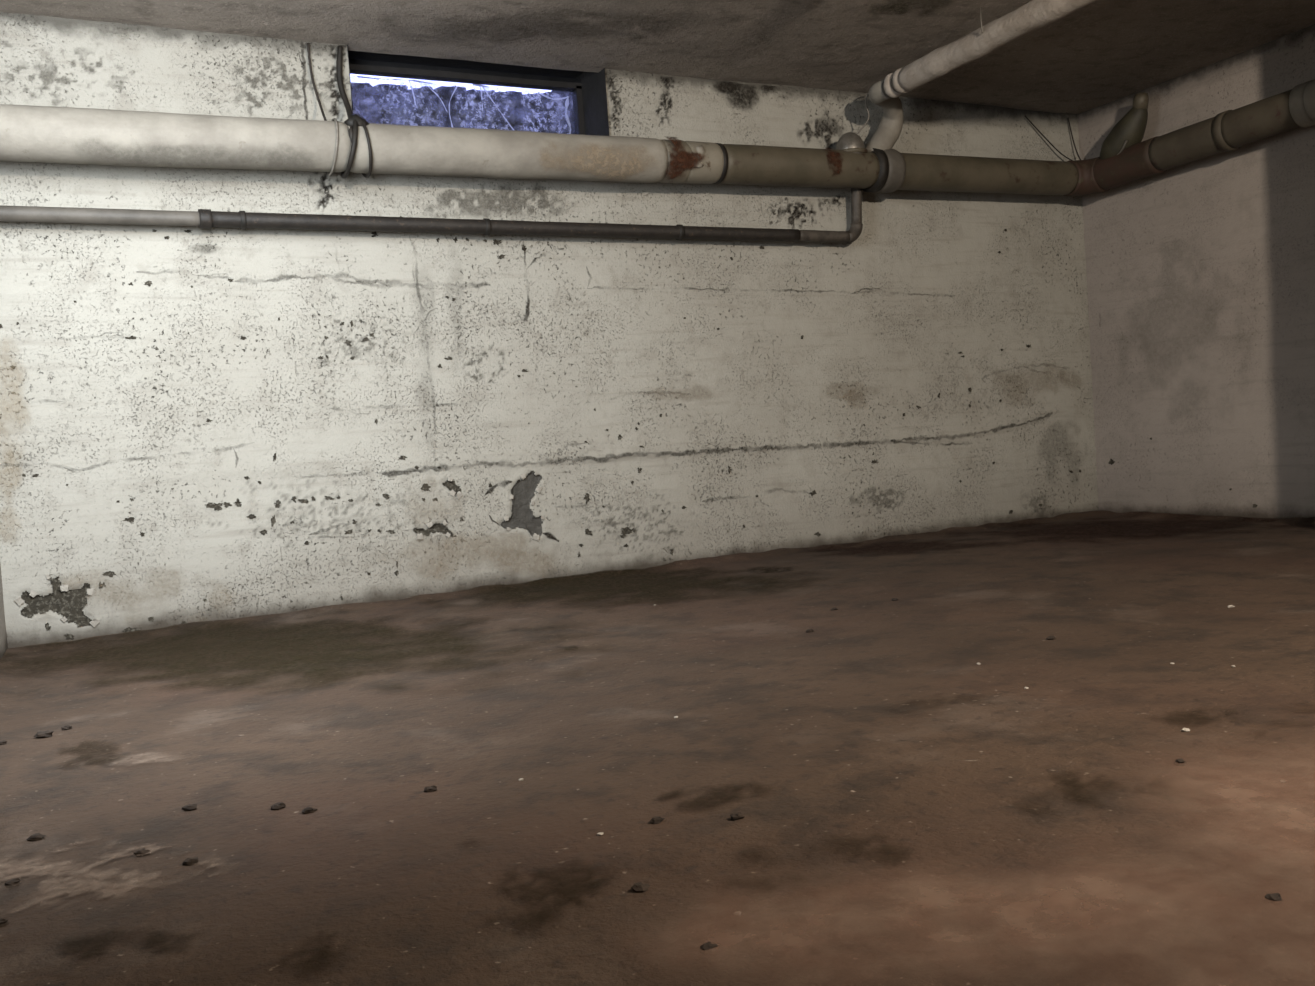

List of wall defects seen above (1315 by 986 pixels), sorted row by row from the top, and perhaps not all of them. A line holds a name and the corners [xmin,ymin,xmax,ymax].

rust [666,137,704,179]
spalling [485,471,559,542]
spalling [14,571,116,639]